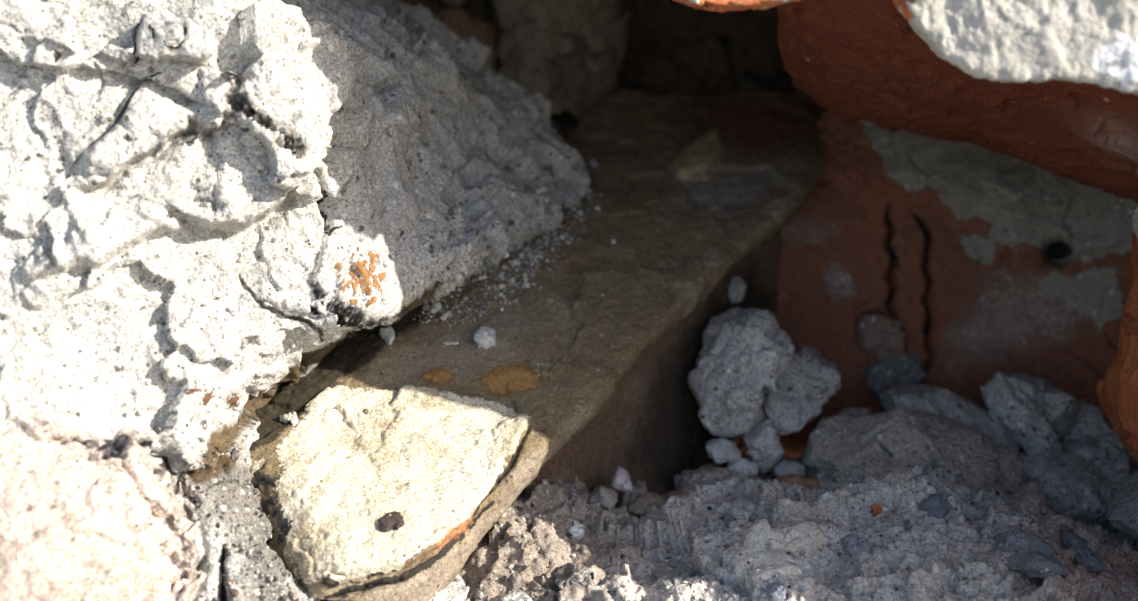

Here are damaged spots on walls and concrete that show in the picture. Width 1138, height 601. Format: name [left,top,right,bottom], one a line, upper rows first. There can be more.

spalling [674,0,801,13]
spalling [892,0,914,21]
crack [73,17,186,166]
crack [239,273,325,342]
rust [335,250,386,307]
crack [856,202,932,370]